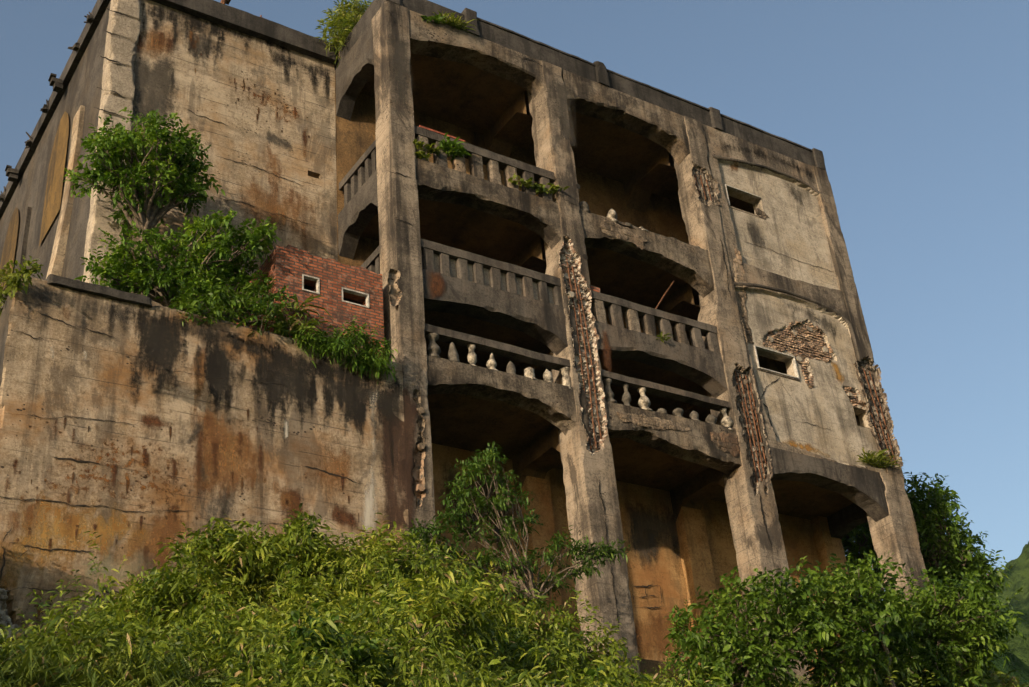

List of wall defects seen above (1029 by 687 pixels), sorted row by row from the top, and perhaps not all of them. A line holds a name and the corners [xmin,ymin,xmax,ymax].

water stain [132,58,174,125]
rust [137,30,173,59]
water stain [142,3,329,97]
rust [229,78,310,155]
rust [0,408,308,588]
water stain [25,288,405,437]
rust [304,449,359,528]
water stain [364,484,375,529]
peeling [381,386,426,533]
spalling [558,235,691,455]
spalling [733,246,833,389]
spalling [843,357,903,469]